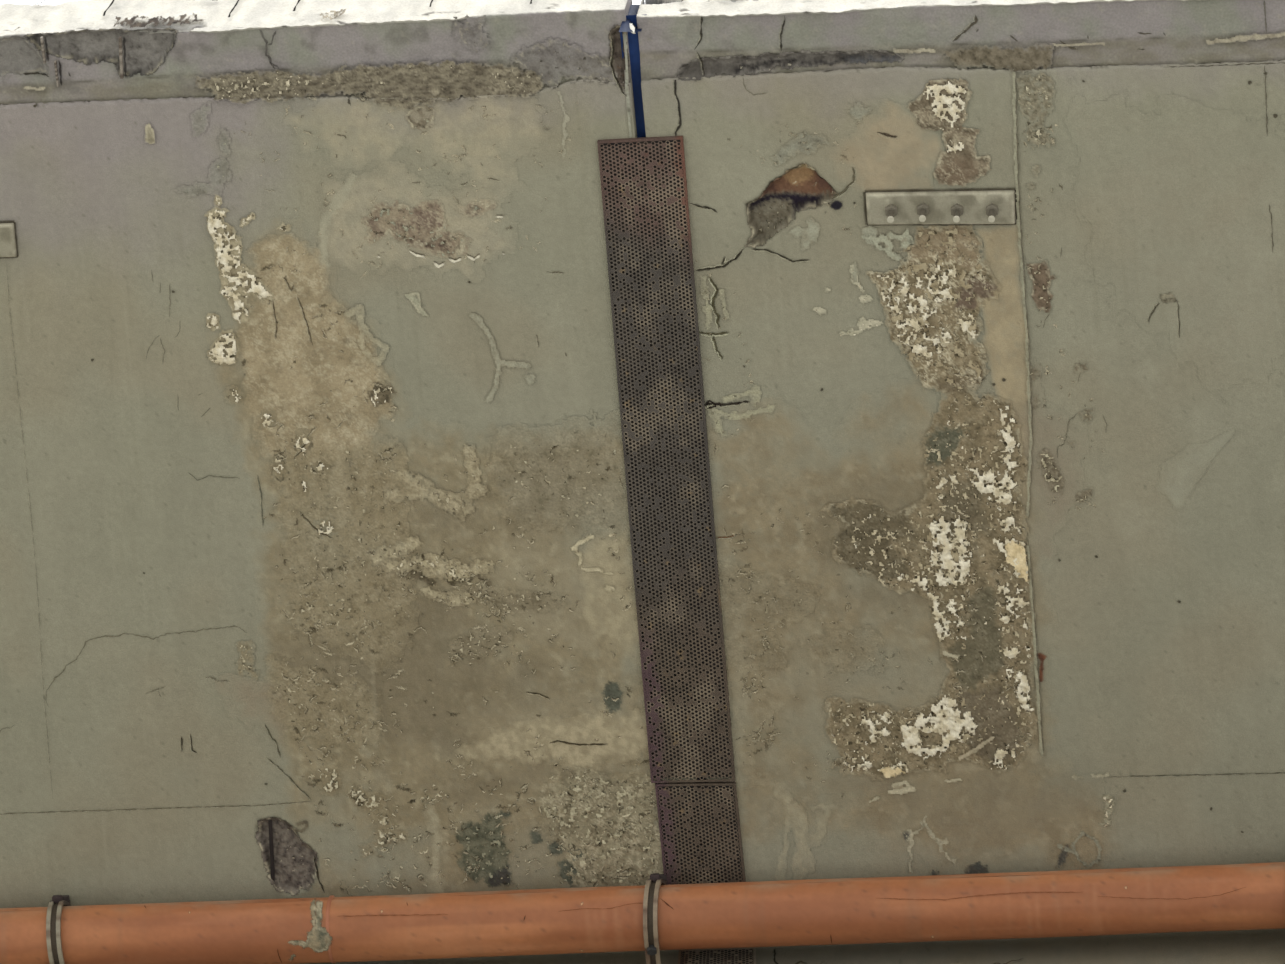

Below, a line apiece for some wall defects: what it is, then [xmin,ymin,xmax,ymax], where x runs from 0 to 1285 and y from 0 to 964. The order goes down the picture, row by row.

spalling [0,13,203,87]
crack [690,203,717,212]
spalling [745,163,837,248]
crack [832,167,855,199]
crack [696,248,809,359]
peeling [204,195,397,500]
crack [705,400,749,409]
leakage [205,91,645,898]
peeling [897,515,972,641]
peeling [936,409,1045,757]
crack [46,626,245,705]
peeling [857,695,978,773]